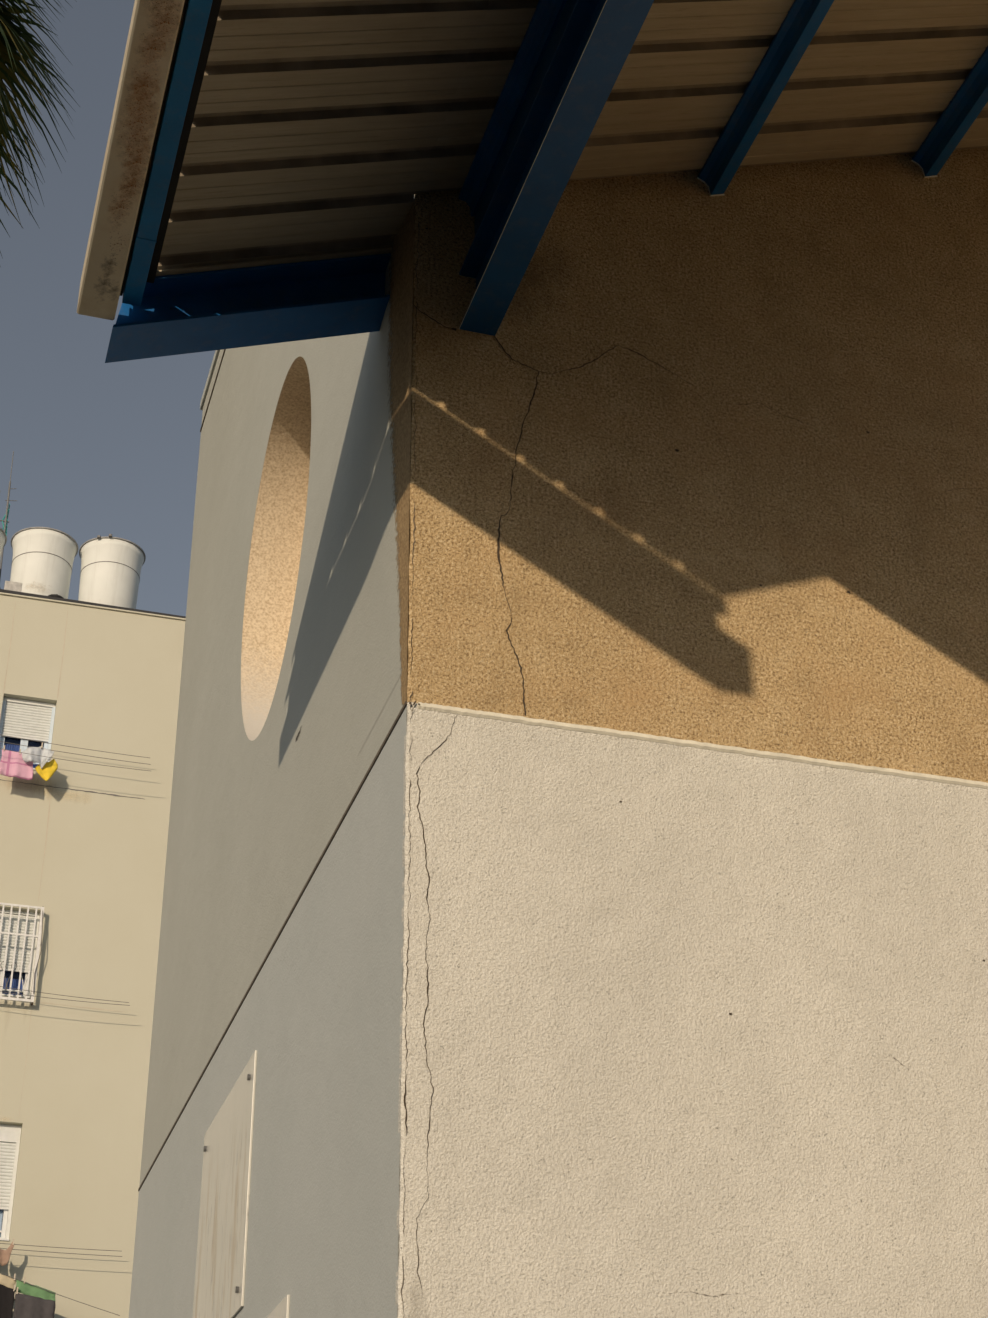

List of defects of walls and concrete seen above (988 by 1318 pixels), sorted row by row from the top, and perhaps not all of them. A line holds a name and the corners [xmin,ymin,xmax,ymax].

crack [401,224,455,1318]
crack [494,336,690,715]